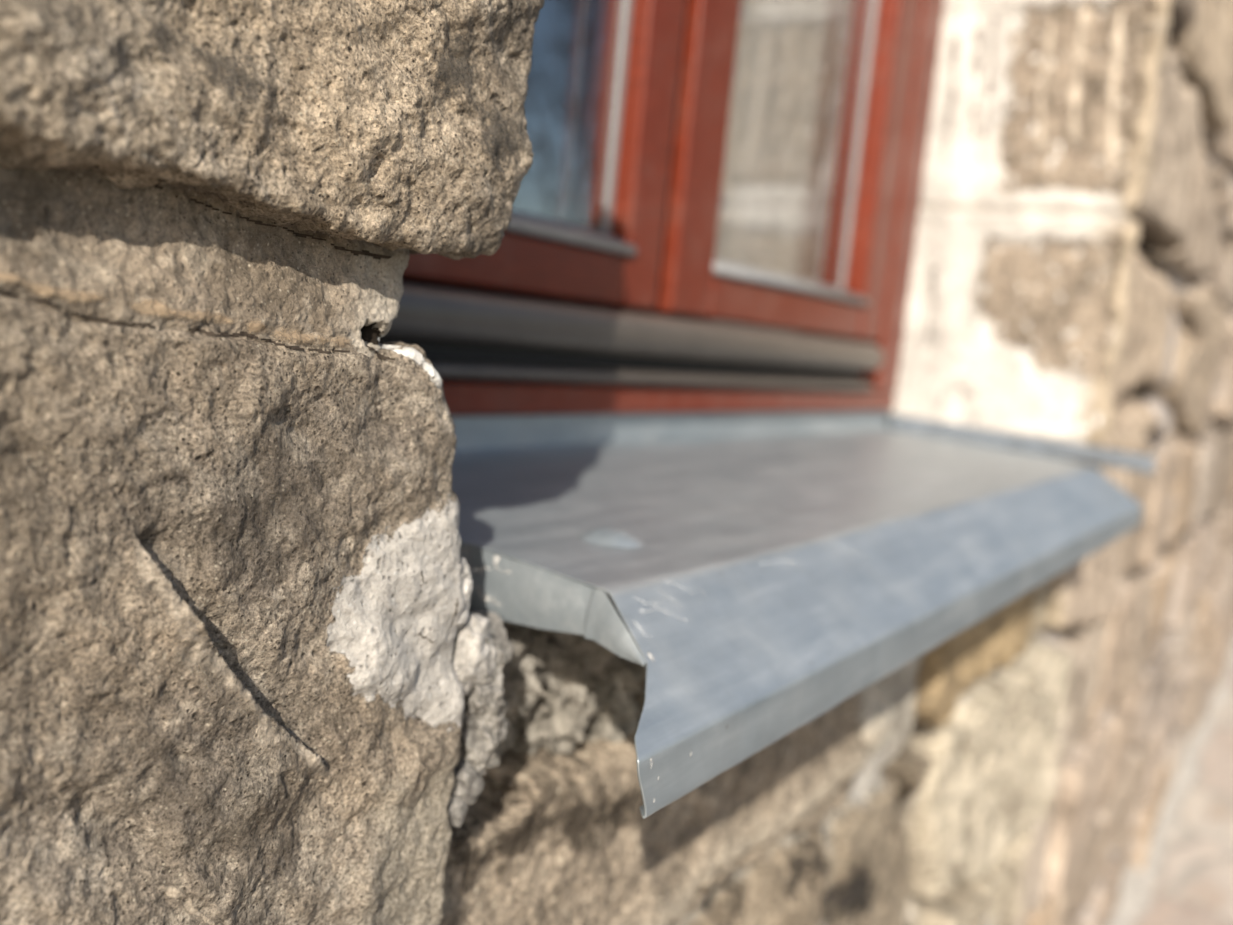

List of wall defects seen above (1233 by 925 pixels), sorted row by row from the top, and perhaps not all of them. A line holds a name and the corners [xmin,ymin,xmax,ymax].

crack [154,179,392,260]
crack [0,288,395,360]
spalling [447,591,654,827]